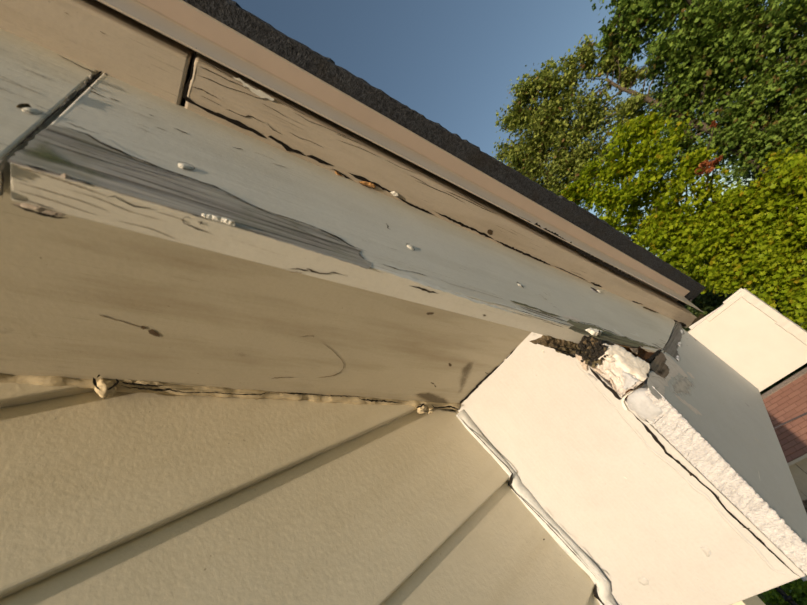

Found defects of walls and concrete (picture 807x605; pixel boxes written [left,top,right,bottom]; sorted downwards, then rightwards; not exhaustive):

crack [0,49,189,240]
peeling [8,121,371,269]
crack [194,60,496,214]
peeling [567,313,704,381]